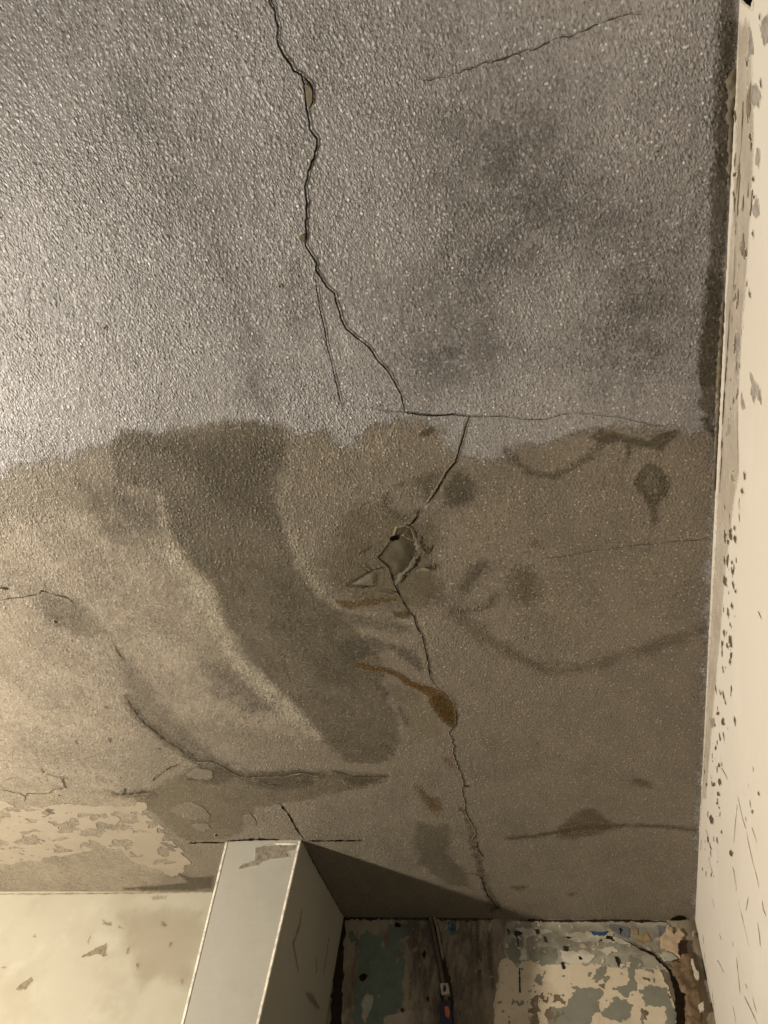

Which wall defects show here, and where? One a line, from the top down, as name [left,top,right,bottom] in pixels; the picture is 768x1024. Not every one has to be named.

peeling [740,0,768,70]
water stain [698,0,736,436]
peeling [732,77,762,268]
crack [266,0,673,909]
peeling [725,281,762,439]
peeling [0,506,307,892]
crack [112,696,385,914]
water stain [0,420,715,920]
corrosion [353,664,456,727]
spalling [702,525,737,877]
peeling [349,924,411,1024]
peeling [493,916,704,1024]